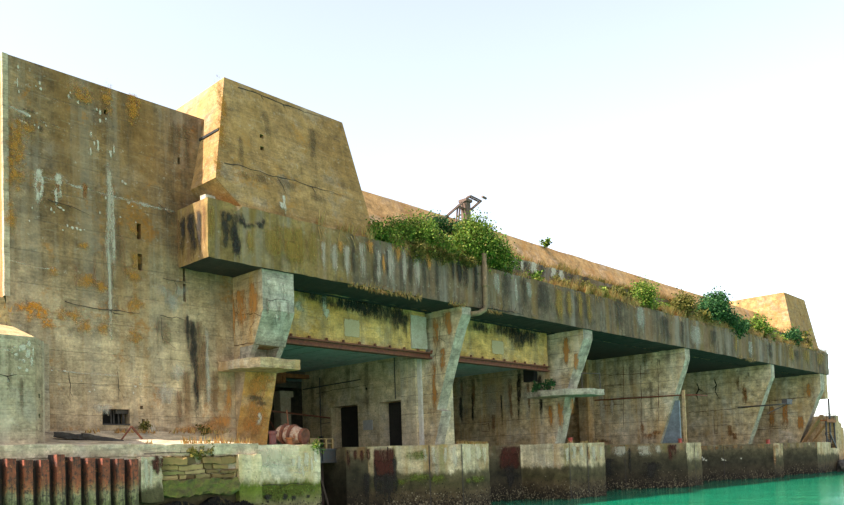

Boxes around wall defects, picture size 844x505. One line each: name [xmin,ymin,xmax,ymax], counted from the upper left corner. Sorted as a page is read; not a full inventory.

crack [225,163,343,196]
water stain [107,173,166,312]
water stain [180,210,211,256]
water stain [221,212,393,280]
water stain [403,253,426,283]
water stain [301,292,410,336]
water stain [473,322,538,350]
water stain [186,315,199,412]
corrosion [346,448,395,479]
corrosion [499,446,521,469]